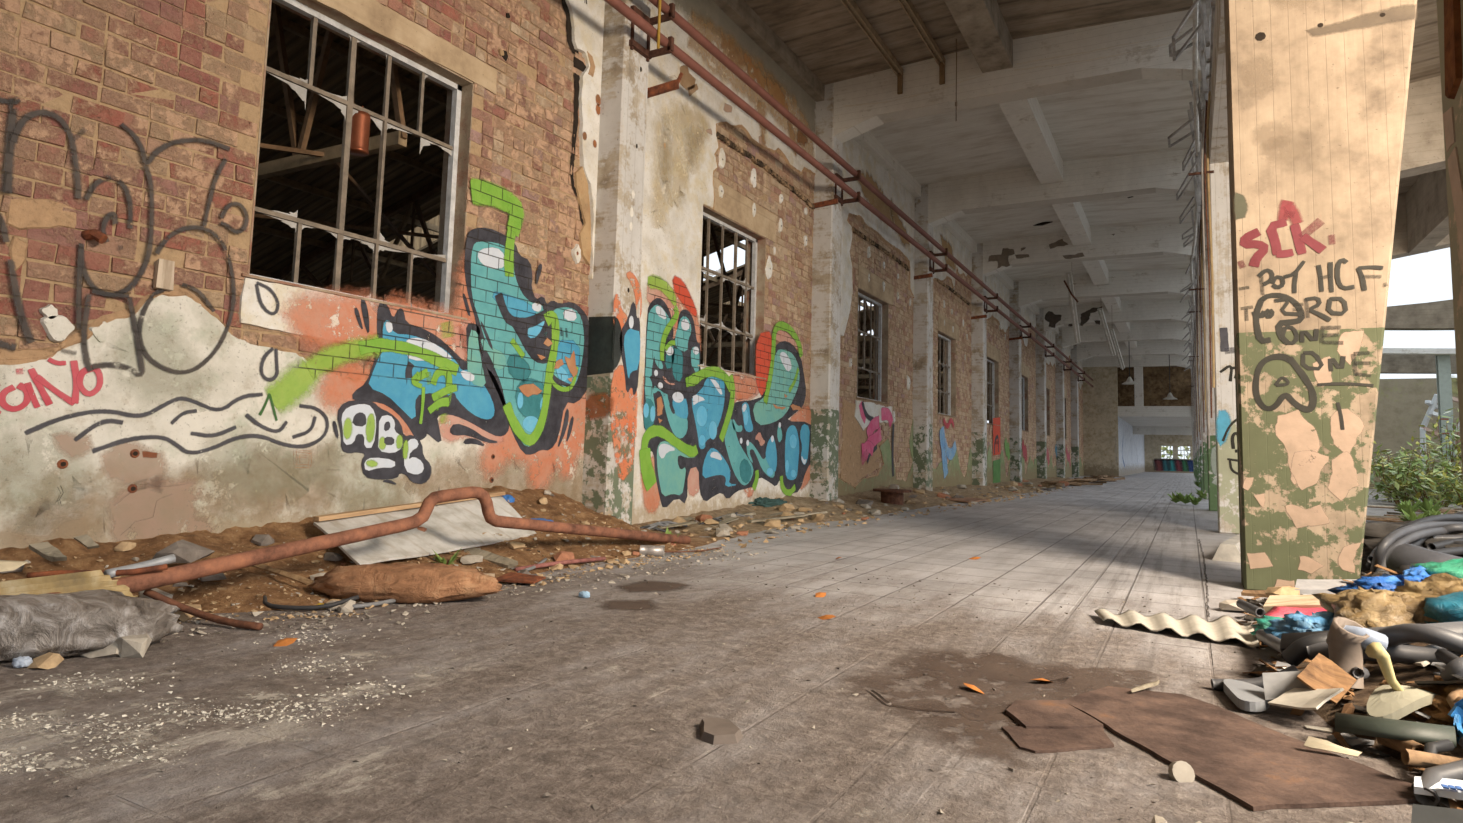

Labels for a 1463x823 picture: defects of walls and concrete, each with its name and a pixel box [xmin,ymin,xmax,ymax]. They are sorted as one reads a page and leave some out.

crack [562,0,587,225]
flaking render [706,104,815,210]
peeling [1443,106,1463,267]
peeling [1313,331,1364,387]
flaking render [56,435,211,541]
peeling [1243,477,1265,508]
peeling [1275,409,1364,528]
peeling [1247,543,1361,587]
water stain [853,651,1152,759]